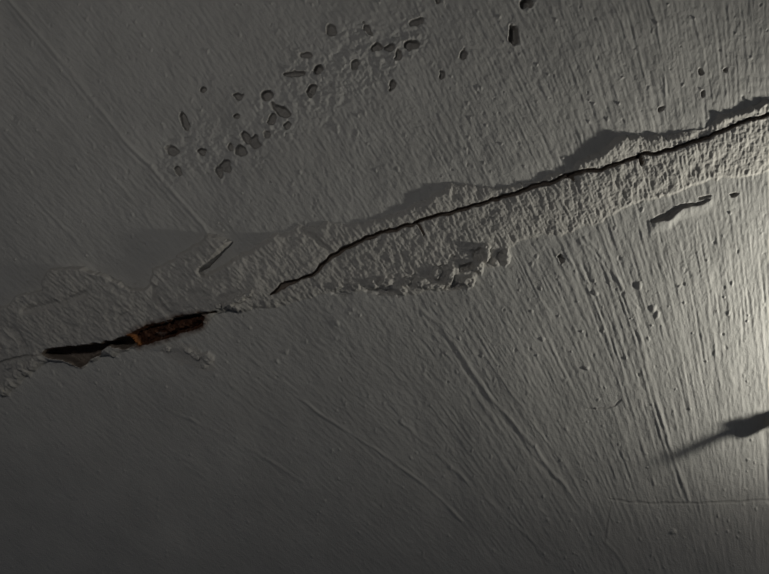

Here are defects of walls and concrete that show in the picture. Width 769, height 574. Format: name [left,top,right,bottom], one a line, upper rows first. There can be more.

crack [270,113,769,295]
rust [120,308,212,352]